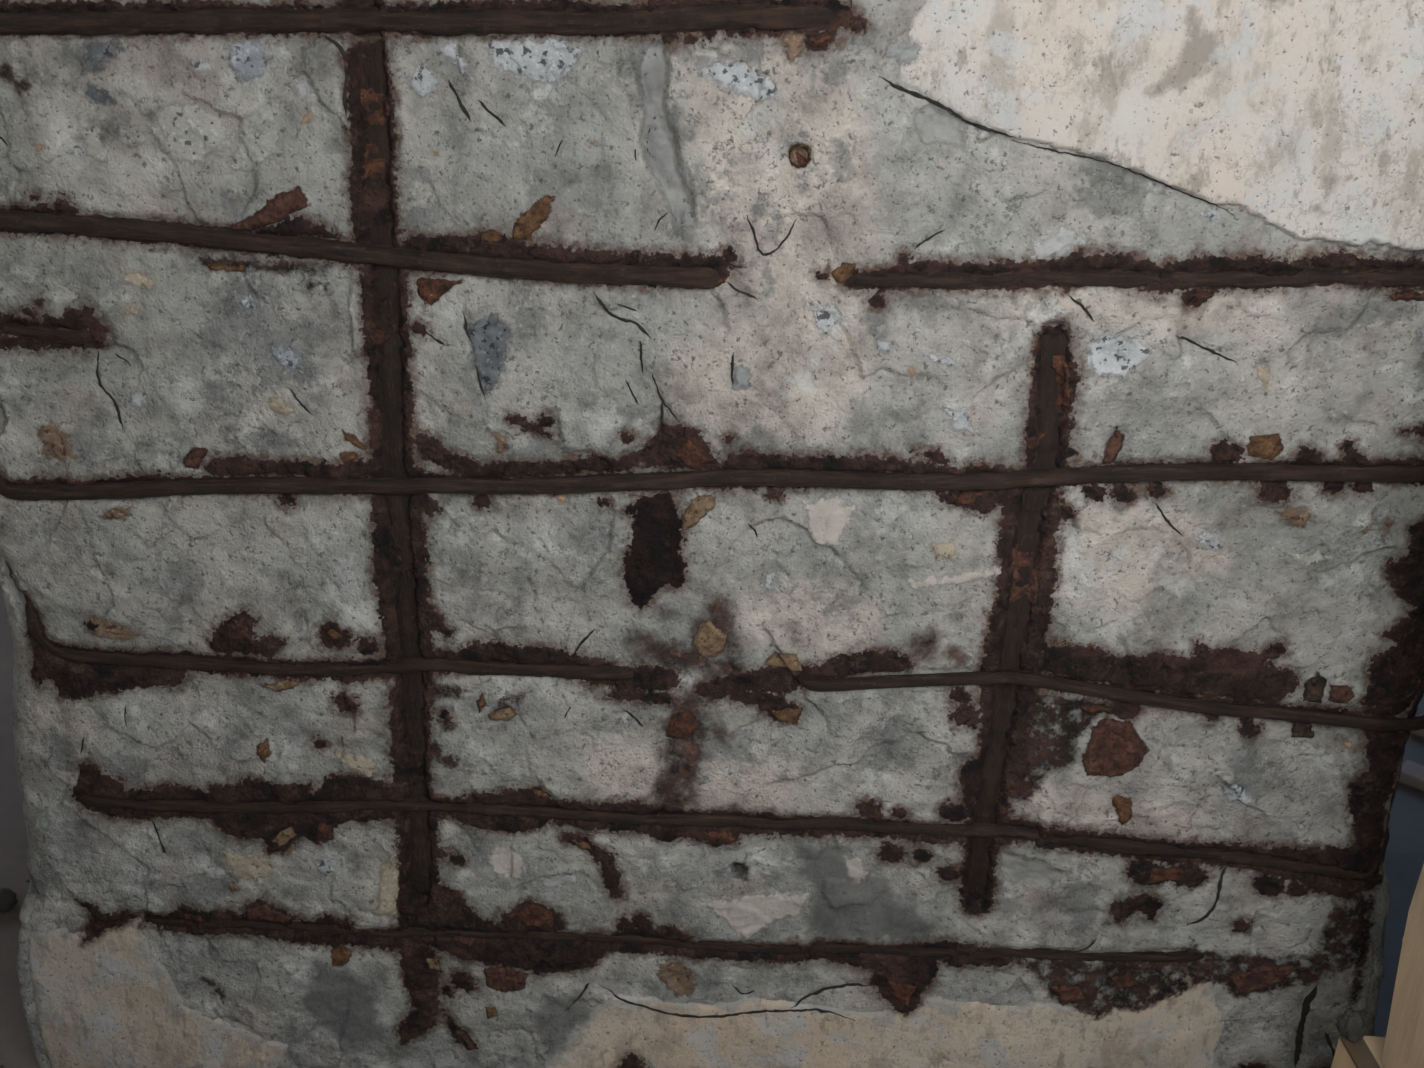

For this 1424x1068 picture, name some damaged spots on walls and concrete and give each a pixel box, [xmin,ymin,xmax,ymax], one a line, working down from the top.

spalling [0,0,343,9]
spalling [0,32,365,243]
rust [0,0,871,289]
spalling [385,0,1424,478]
crack [879,76,1233,215]
crack [96,351,131,432]
rust [0,230,1424,1068]
spalling [0,232,1424,1068]
crack [567,983,871,1021]